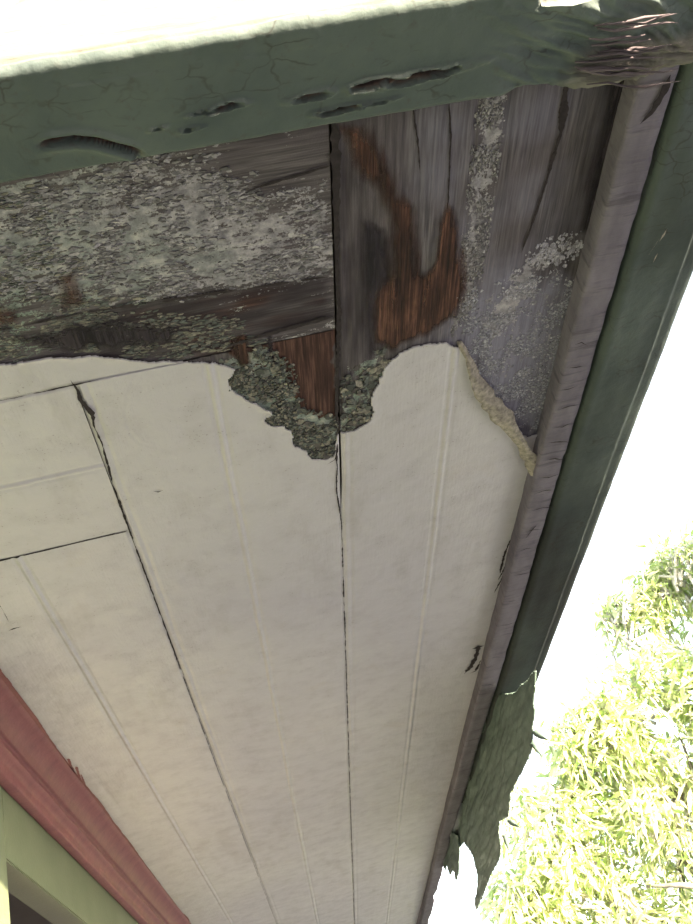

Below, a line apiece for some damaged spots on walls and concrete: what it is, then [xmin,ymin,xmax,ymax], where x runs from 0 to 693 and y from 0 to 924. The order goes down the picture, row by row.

peeling [0,0,398,66]
water stain [20,321,174,352]
water stain [230,336,250,366]
peeling [0,84,612,476]
crack [0,123,355,924]
peeling [443,671,548,910]